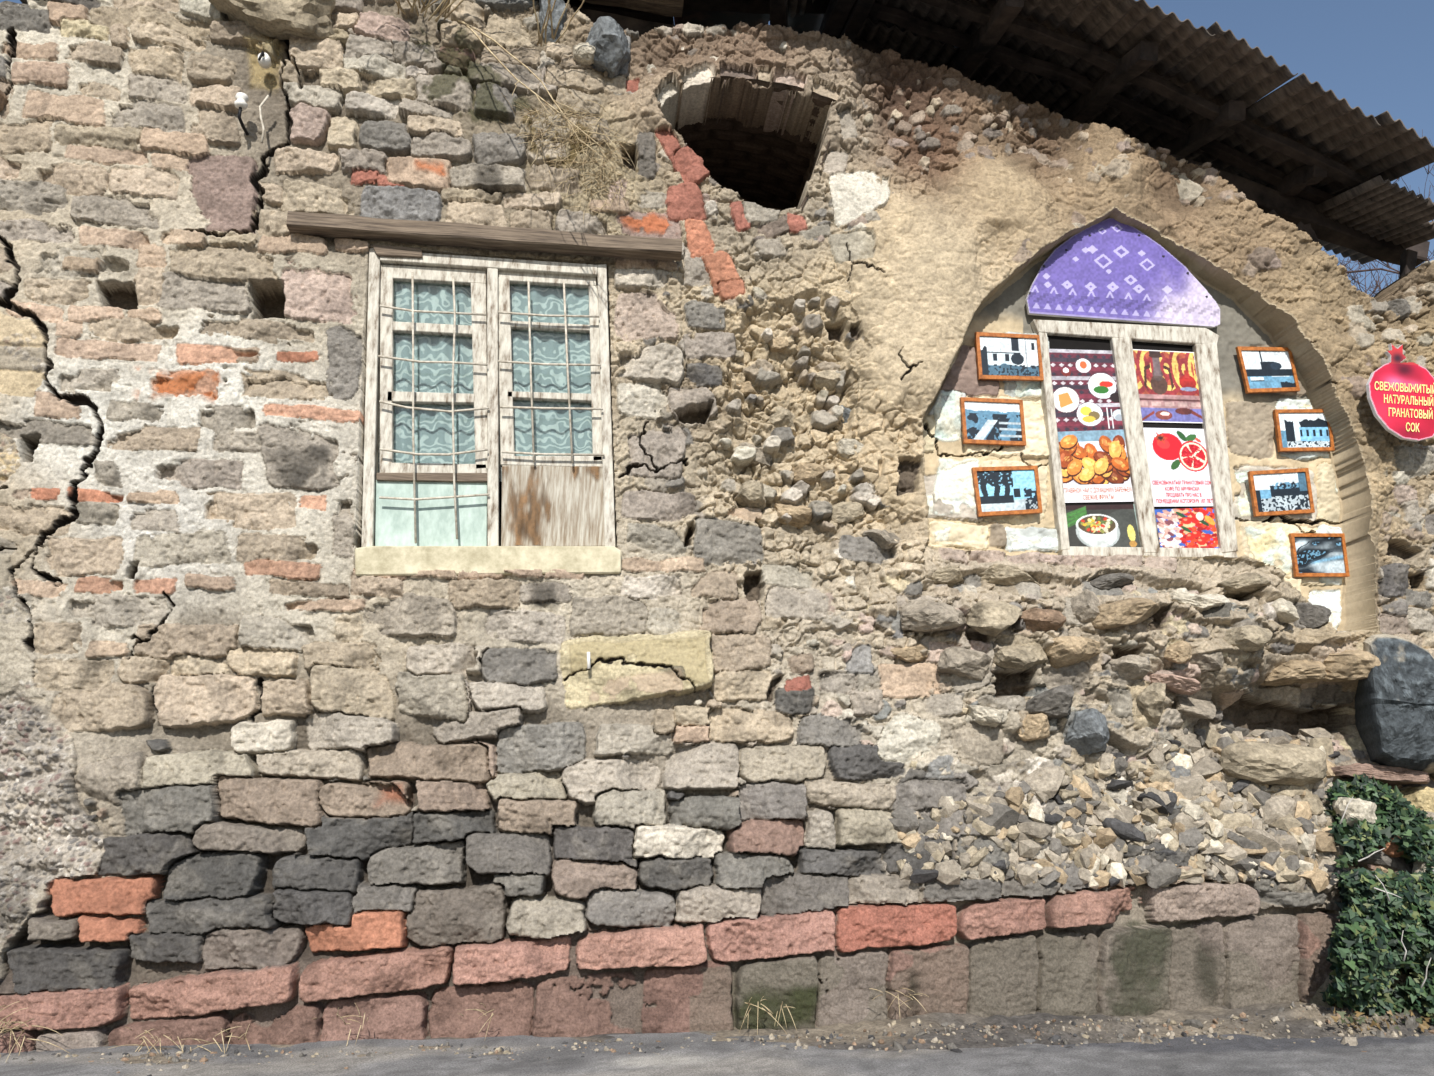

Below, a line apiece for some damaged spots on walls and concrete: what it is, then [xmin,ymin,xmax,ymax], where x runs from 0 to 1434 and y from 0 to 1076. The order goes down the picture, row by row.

crack [6,26,18,95]
crack [186,39,304,238]
crack [0,235,105,650]
crack [564,656,697,692]